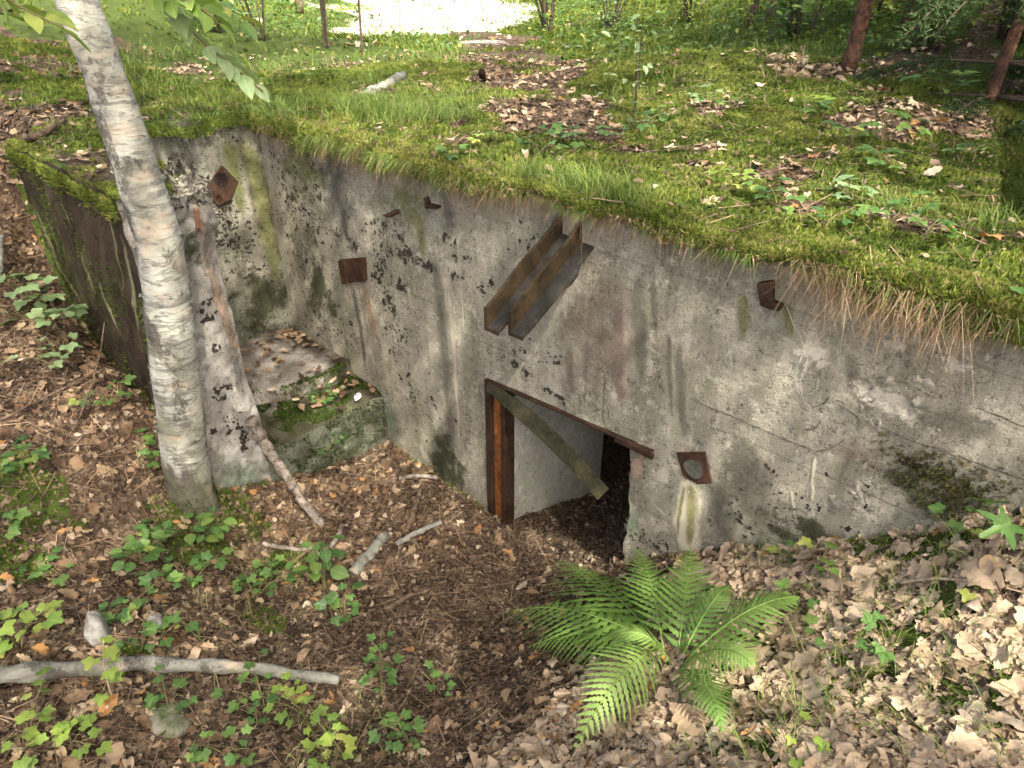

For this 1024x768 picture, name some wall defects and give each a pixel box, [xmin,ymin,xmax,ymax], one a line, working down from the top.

rust [193,208,203,231]
water stain [671,478,704,553]